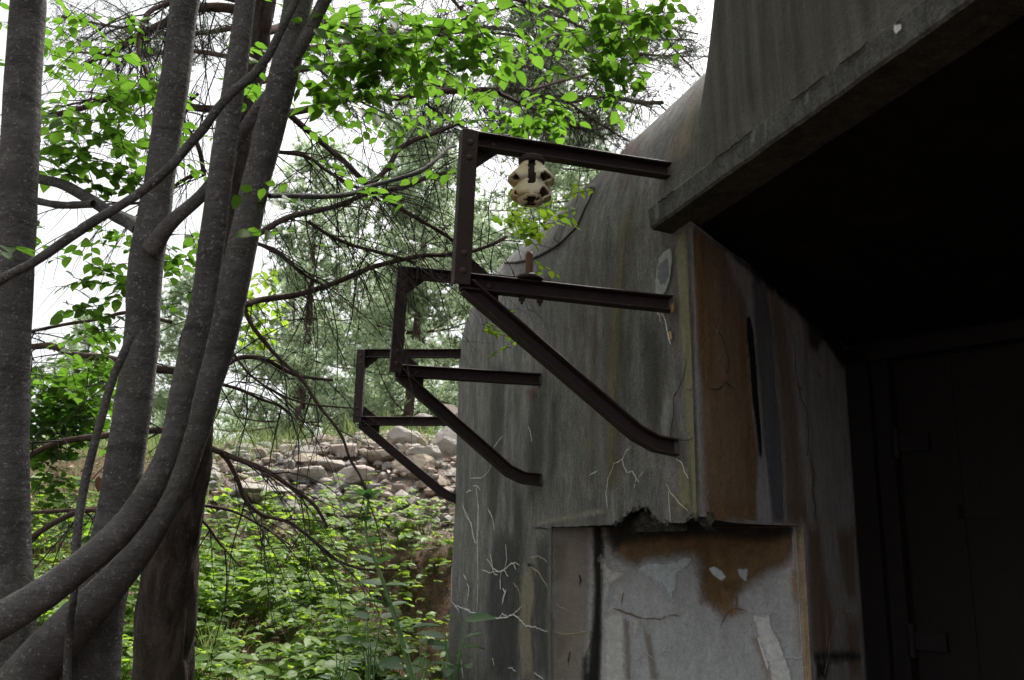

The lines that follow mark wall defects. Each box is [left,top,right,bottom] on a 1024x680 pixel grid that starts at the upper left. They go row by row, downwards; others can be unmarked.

crack [589,446,643,502]
spalling [614,505,717,532]
crack [451,438,588,665]
peeling [638,558,691,598]
corrosion [605,527,792,614]
peeling [710,567,725,580]